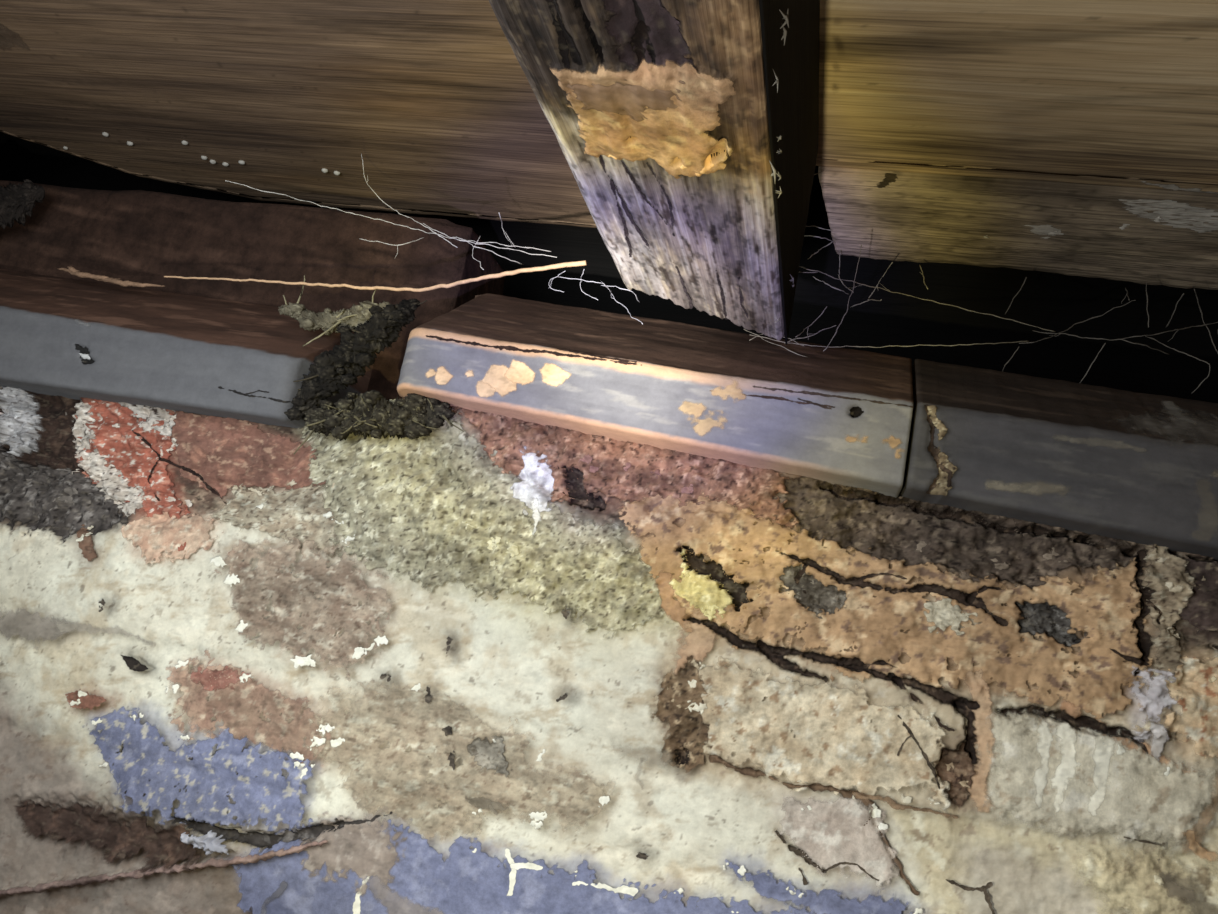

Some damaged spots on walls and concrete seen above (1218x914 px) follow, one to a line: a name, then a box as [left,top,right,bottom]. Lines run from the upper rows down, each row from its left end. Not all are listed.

rust [426,360,571,397]
rust [679,382,745,436]
leakage [1055,401,1218,452]
crack [132,430,226,504]
leakage [510,446,554,535]
leakage [986,481,1066,494]
crack [781,552,1008,626]
crack [1110,550,1162,675]
spalling [0,399,1218,914]
crack [682,617,1148,896]
crack [946,879,995,914]